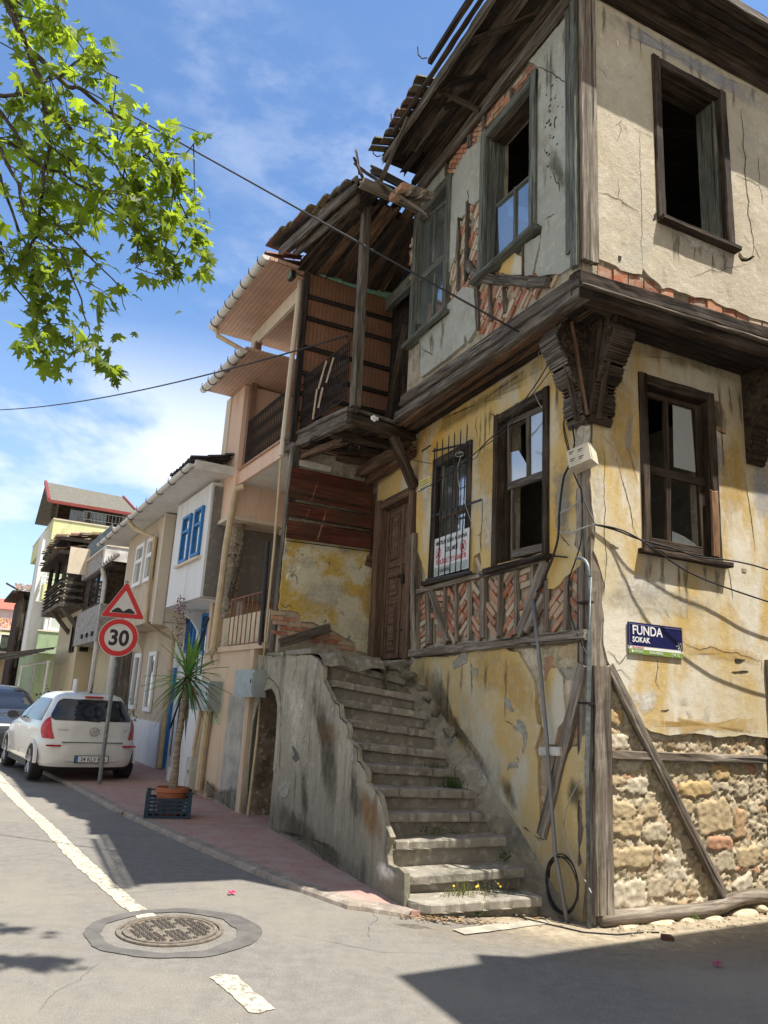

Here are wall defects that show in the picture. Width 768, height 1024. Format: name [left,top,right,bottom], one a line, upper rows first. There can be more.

flaking render [448,64,537,174]
crack [693,113,763,277]
flaking render [449,202,560,336]
flaking render [597,255,674,298]
flaking render [688,297,768,327]
flaking render [271,610,368,651]
leakage [287,681,335,788]
peeling [666,699,747,732]
leakage [378,862,394,879]